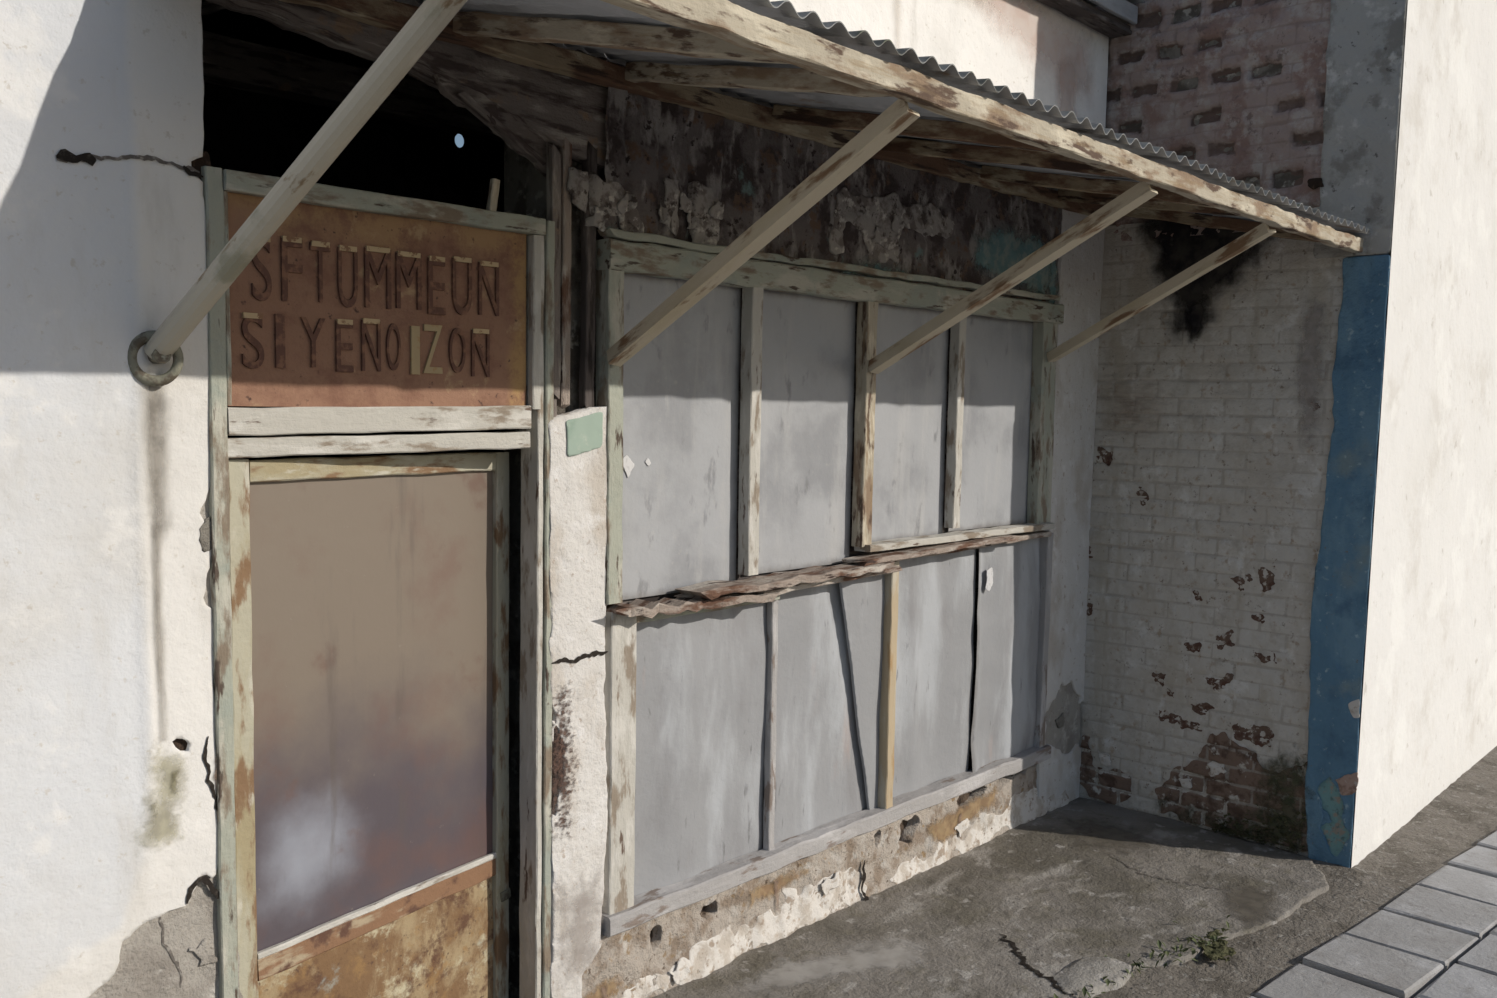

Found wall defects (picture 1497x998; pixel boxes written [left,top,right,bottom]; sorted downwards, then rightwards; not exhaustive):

crack [56,149,203,178]
peeling [567,167,724,245]
peeling [829,187,955,265]
leakage [148,386,165,687]
crack [552,650,608,664]
leakage [150,760,181,841]
crack [203,736,217,811]
peeling [890,682,1132,885]
flaking render [1151,672,1360,856]
flaking render [89,875,219,998]
peeling [622,867,867,998]
crack [1000,934,1074,996]